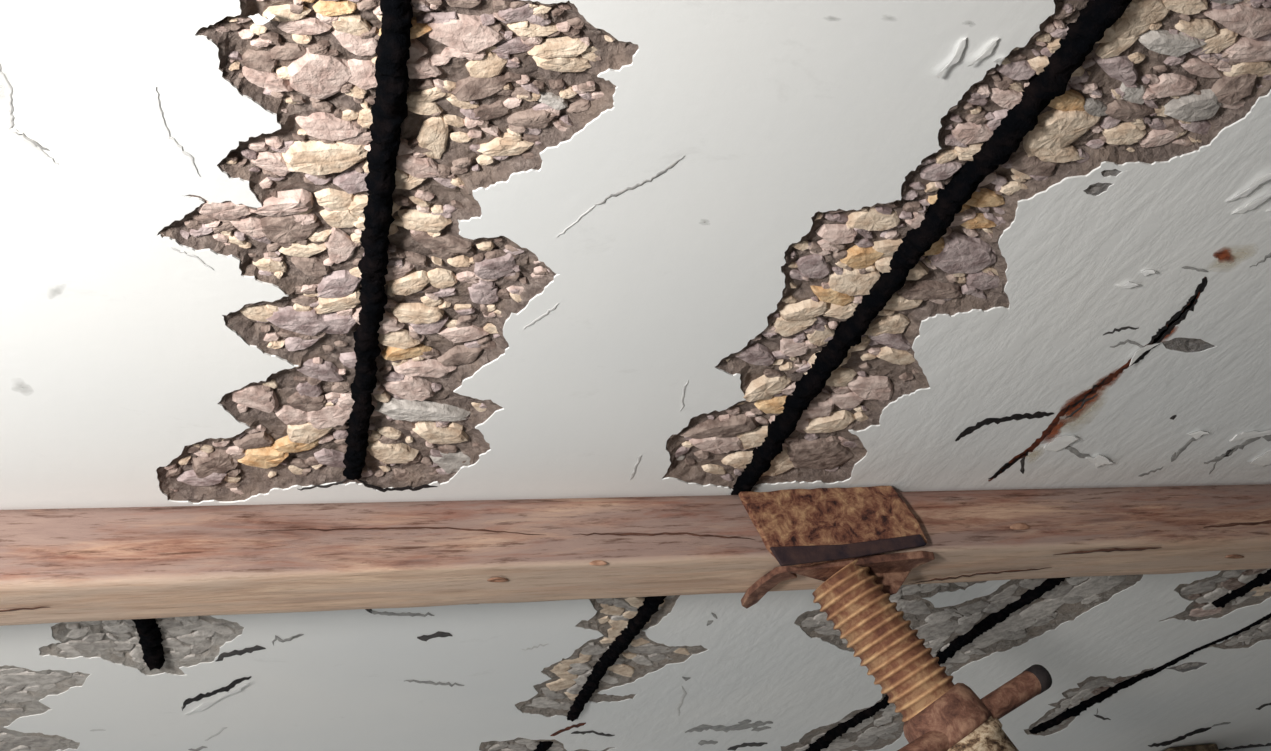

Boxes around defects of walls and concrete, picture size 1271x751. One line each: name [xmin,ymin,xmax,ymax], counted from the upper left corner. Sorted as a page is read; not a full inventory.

crack [0,66,58,164]
spalling [157,0,639,503]
spalling [663,0,1271,489]
crack [1250,252,1271,267]
rust [1044,372,1119,440]
crack [1139,415,1271,477]
spalling [0,616,250,751]
spalling [515,595,708,717]
spalling [781,694,904,751]
spalling [889,574,1143,676]
spalling [1024,662,1207,736]
spalling [1160,568,1271,621]